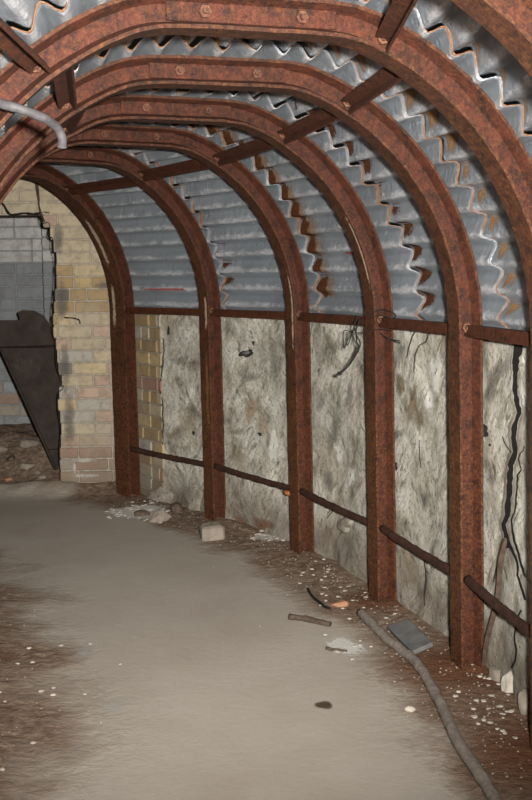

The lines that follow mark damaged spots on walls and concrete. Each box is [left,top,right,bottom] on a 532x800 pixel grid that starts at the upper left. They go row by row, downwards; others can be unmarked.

corrosion [190,124,244,145]
corrosion [327,124,386,201]
corrosion [399,89,417,107]
corrosion [254,154,333,297]
corrosion [392,203,436,310]
crack [499,345,531,668]